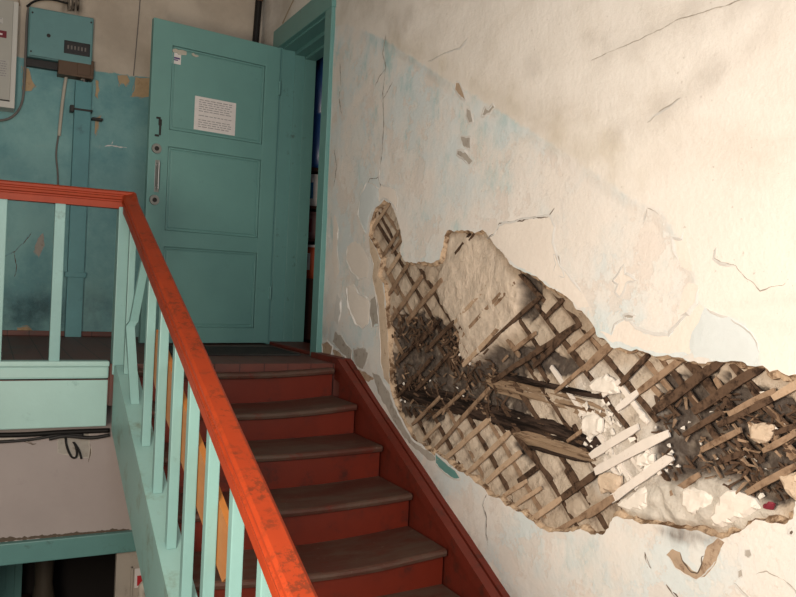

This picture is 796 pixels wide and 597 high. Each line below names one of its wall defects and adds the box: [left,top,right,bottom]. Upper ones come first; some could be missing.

crack [592,0,740,60]
peeling [117,74,150,99]
crack [368,37,391,186]
peeling [454,81,495,124]
crack [649,98,679,122]
peeling [456,135,473,166]
crack [712,248,782,291]
flaking render [322,200,796,581]